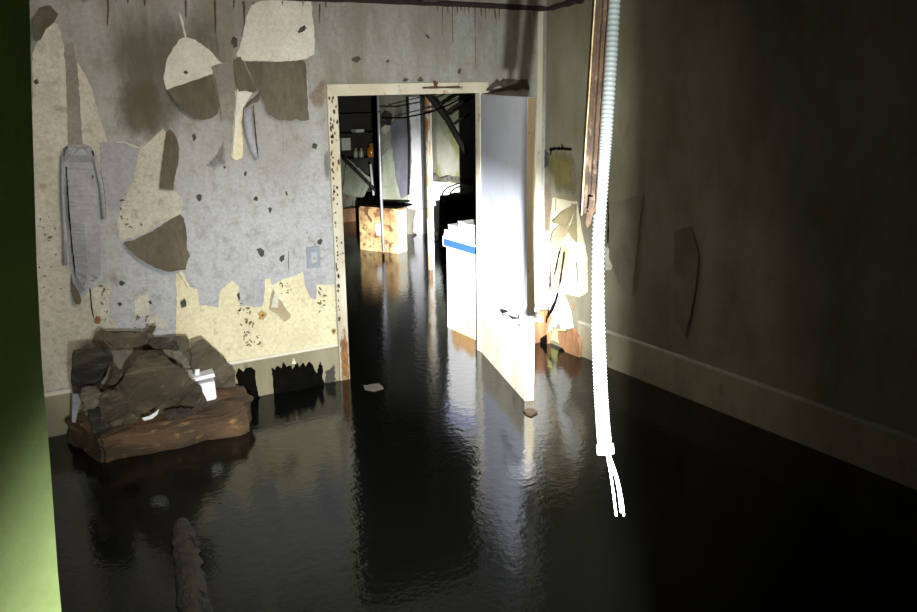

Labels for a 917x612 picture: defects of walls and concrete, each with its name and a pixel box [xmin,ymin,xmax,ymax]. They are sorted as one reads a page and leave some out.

water stain [121,30,180,131]
water stain [194,28,211,49]
peeling [32,0,344,391]
peeling [543,198,588,343]
corrosion [332,329,349,380]